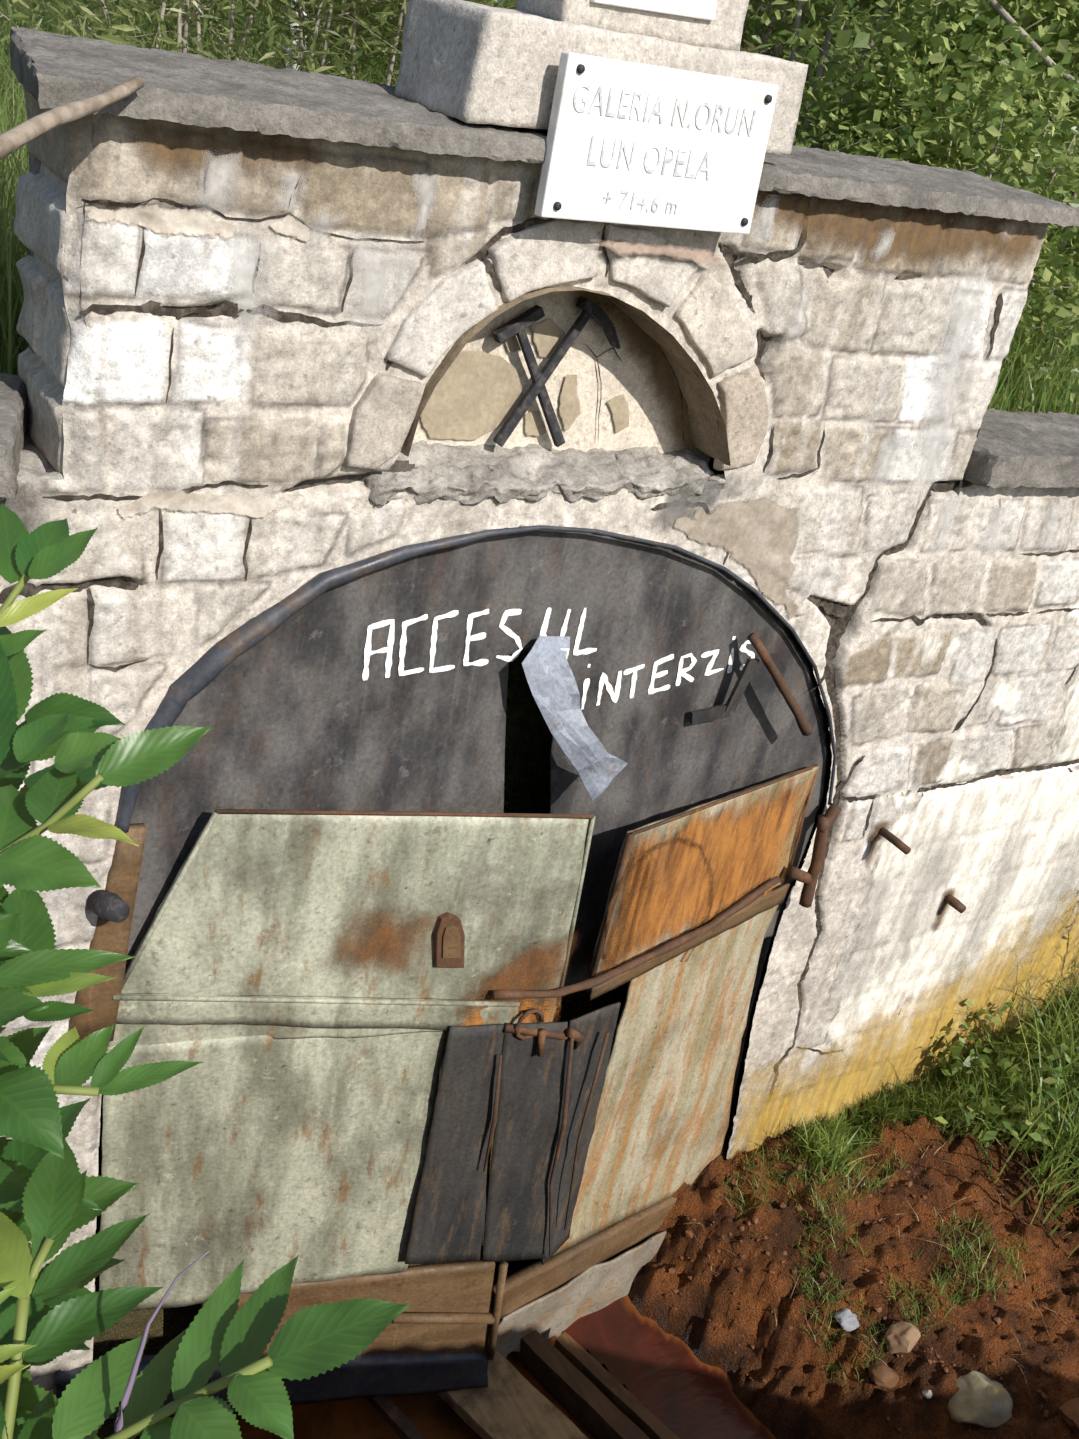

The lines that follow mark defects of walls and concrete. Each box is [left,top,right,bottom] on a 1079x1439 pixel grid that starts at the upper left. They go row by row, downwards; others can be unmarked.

crack [79,155,425,403]
crack [467,217,557,292]
crack [720,216,808,381]
crack [987,293,1003,359]
crack [764,424,825,479]
crack [652,502,711,515]
crack [770,480,1079,1094]
corrosion [340,913,424,964]
corrosion [605,782,808,971]
corrosion [935,890,954,930]
corrosion [464,944,563,1026]
corrosion [732,900,1079,1154]